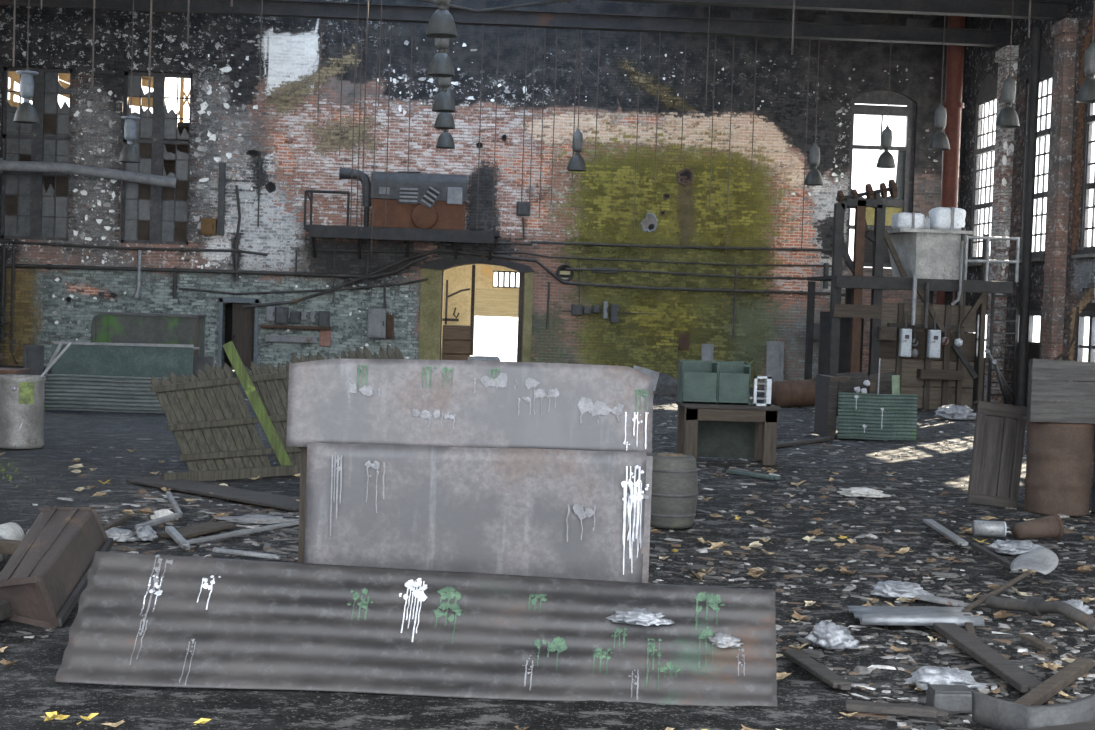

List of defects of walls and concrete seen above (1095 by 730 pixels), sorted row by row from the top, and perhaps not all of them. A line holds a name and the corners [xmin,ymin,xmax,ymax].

peeling [74,89,117,135]
spalling [164,17,846,307]
peeling [73,174,227,270]